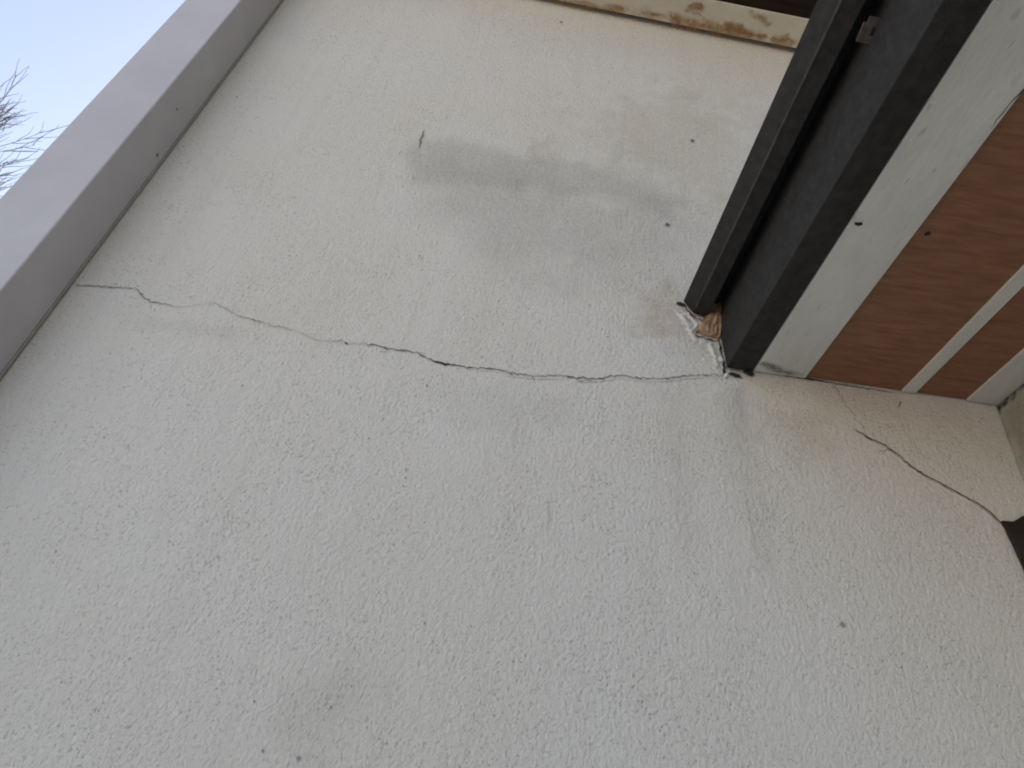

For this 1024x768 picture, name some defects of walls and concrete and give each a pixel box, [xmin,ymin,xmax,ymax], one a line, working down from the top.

corrosion [672,3,793,45]
crack [77,284,754,404]
flaking render [672,306,729,378]
crack [786,376,1001,523]